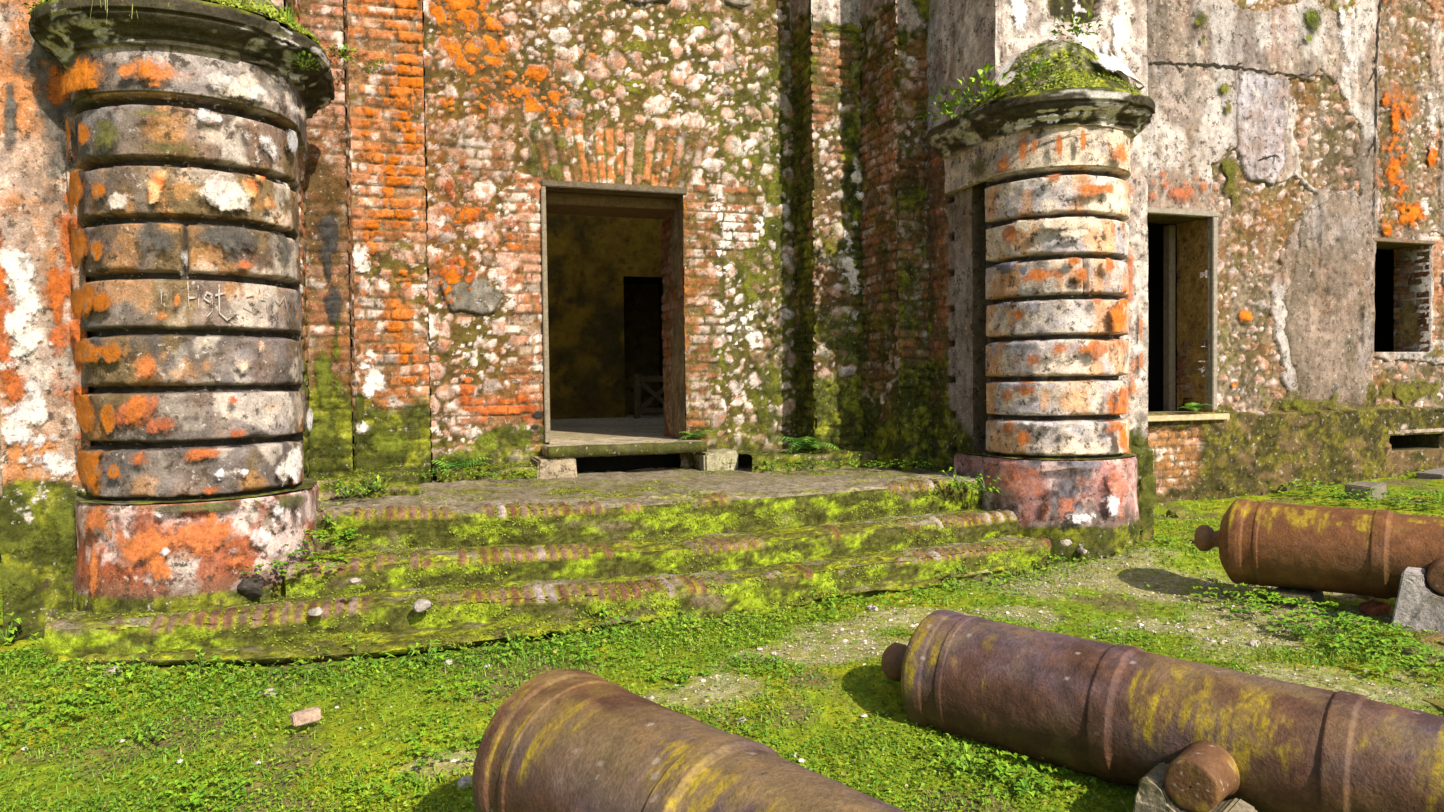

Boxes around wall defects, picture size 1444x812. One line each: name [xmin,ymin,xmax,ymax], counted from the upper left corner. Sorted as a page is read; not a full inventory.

flaking render [624,0,671,9]
flaking render [723,0,752,10]
flaking render [1211,0,1444,415]
flaking render [434,276,504,316]
leakage [138,212,450,434]
leakage [1263,390,1340,415]